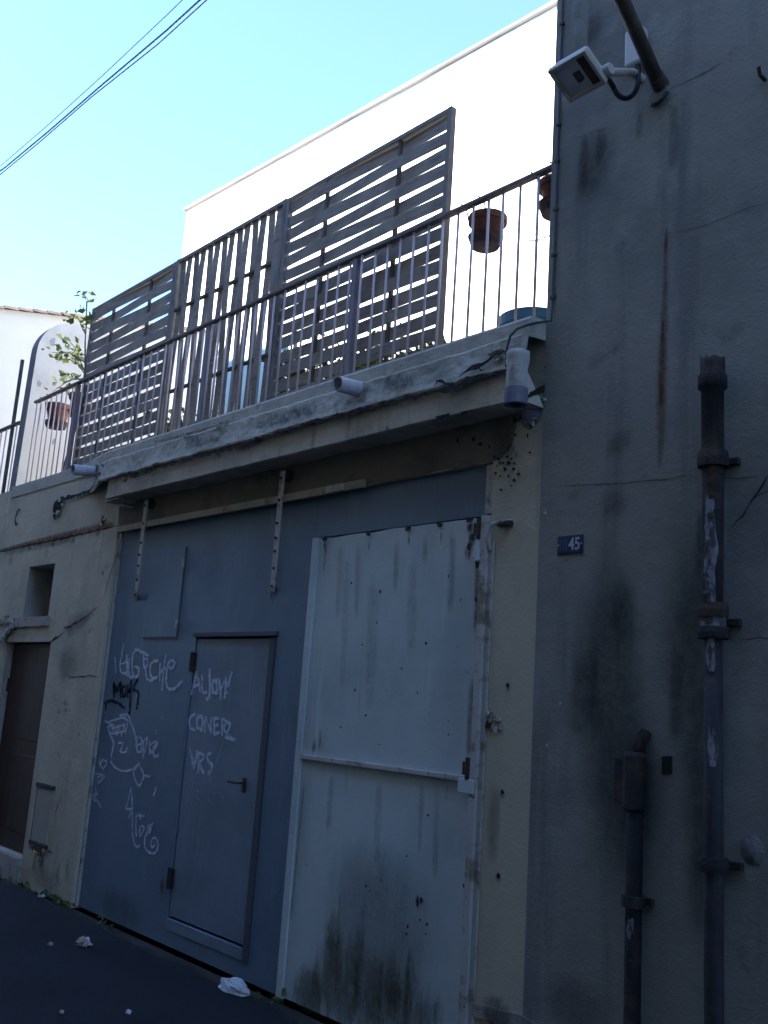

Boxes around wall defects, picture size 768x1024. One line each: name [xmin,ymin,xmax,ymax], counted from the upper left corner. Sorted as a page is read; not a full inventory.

crack [127,351,506,475]
rust [465,517,479,626]
peeling [703,490,719,602]
crack [726,475,768,527]